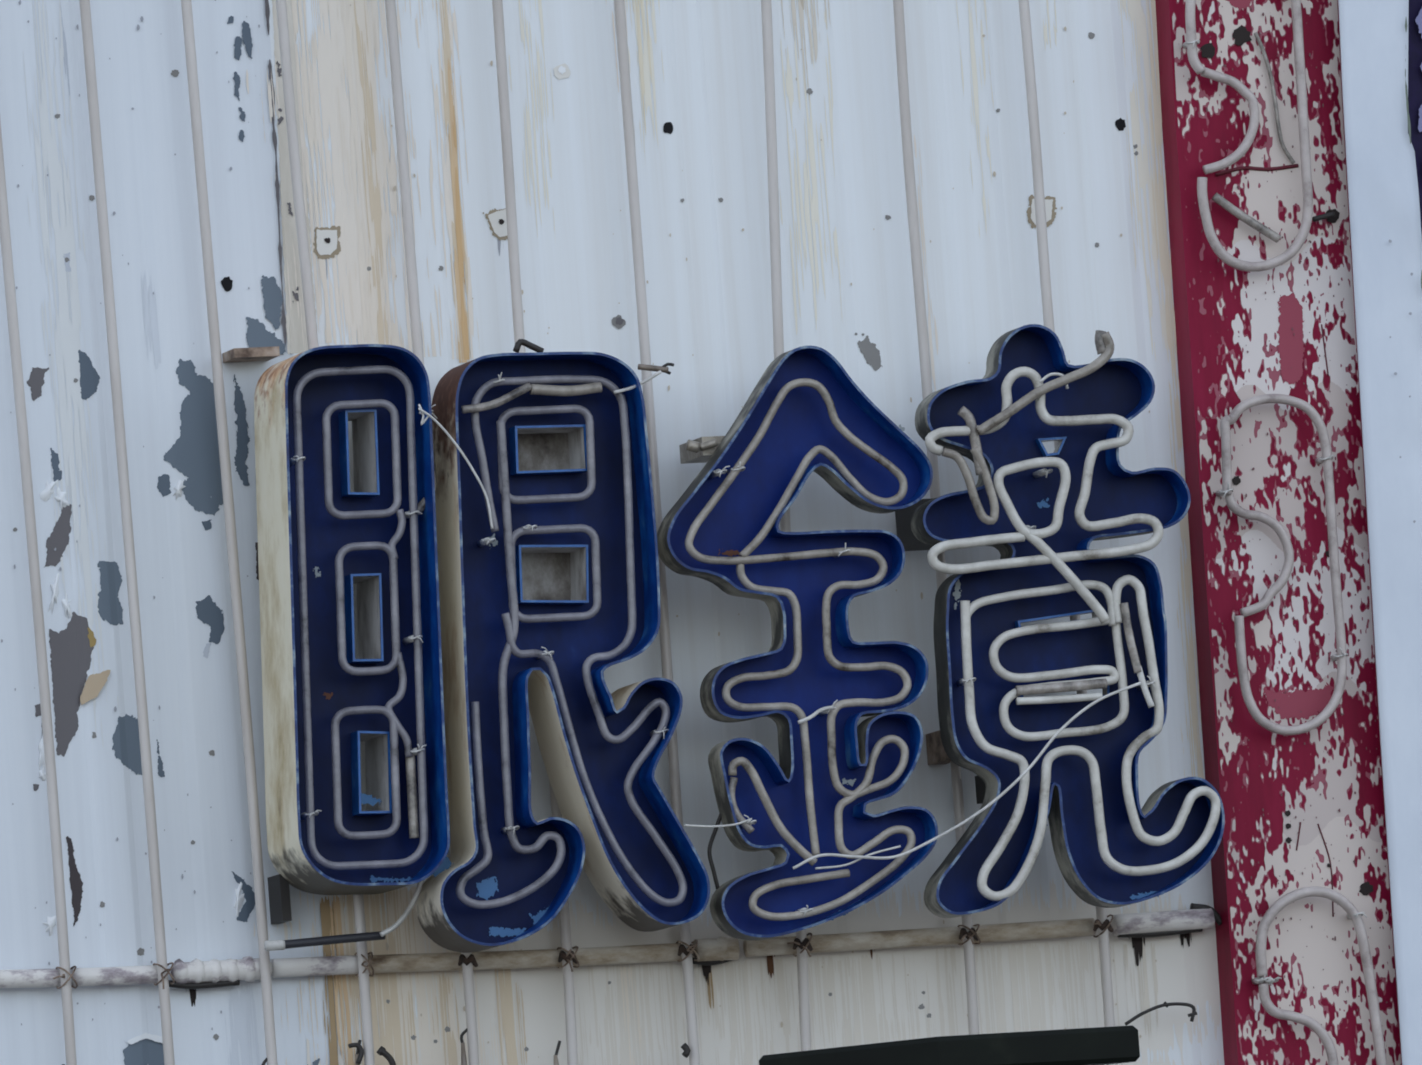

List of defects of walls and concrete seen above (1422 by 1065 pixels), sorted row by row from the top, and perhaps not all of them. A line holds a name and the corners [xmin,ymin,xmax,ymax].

peeling [227,16,253,142]
corrosion [431,0,480,363]
corrosion [483,208,508,240]
peeling [27,367,49,401]
peeling [78,350,100,400]
peeling [157,359,250,530]
peeling [1172,0,1401,1065]
peeling [97,561,123,626]
peeling [195,595,225,658]
peeling [80,670,110,705]
peeling [92,714,165,777]
peeling [123,1033,164,1065]